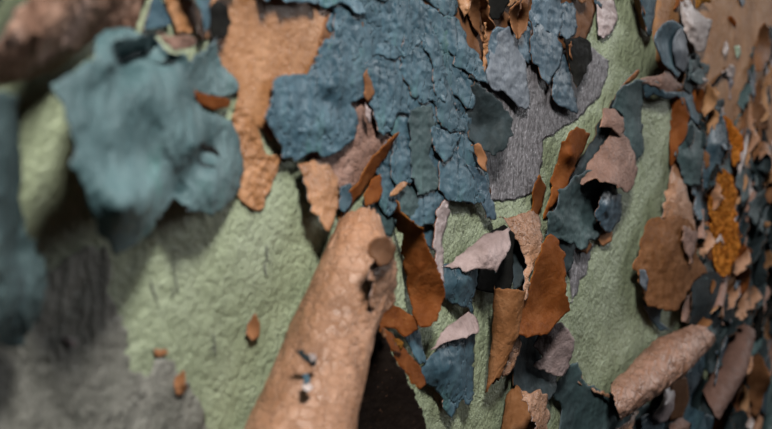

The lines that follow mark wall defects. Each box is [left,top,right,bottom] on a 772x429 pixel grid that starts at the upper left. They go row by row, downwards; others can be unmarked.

flaking render [0,90,207,429]
peeling [245,313,260,340]
peeling [264,0,772,429]
rust [706,115,744,277]